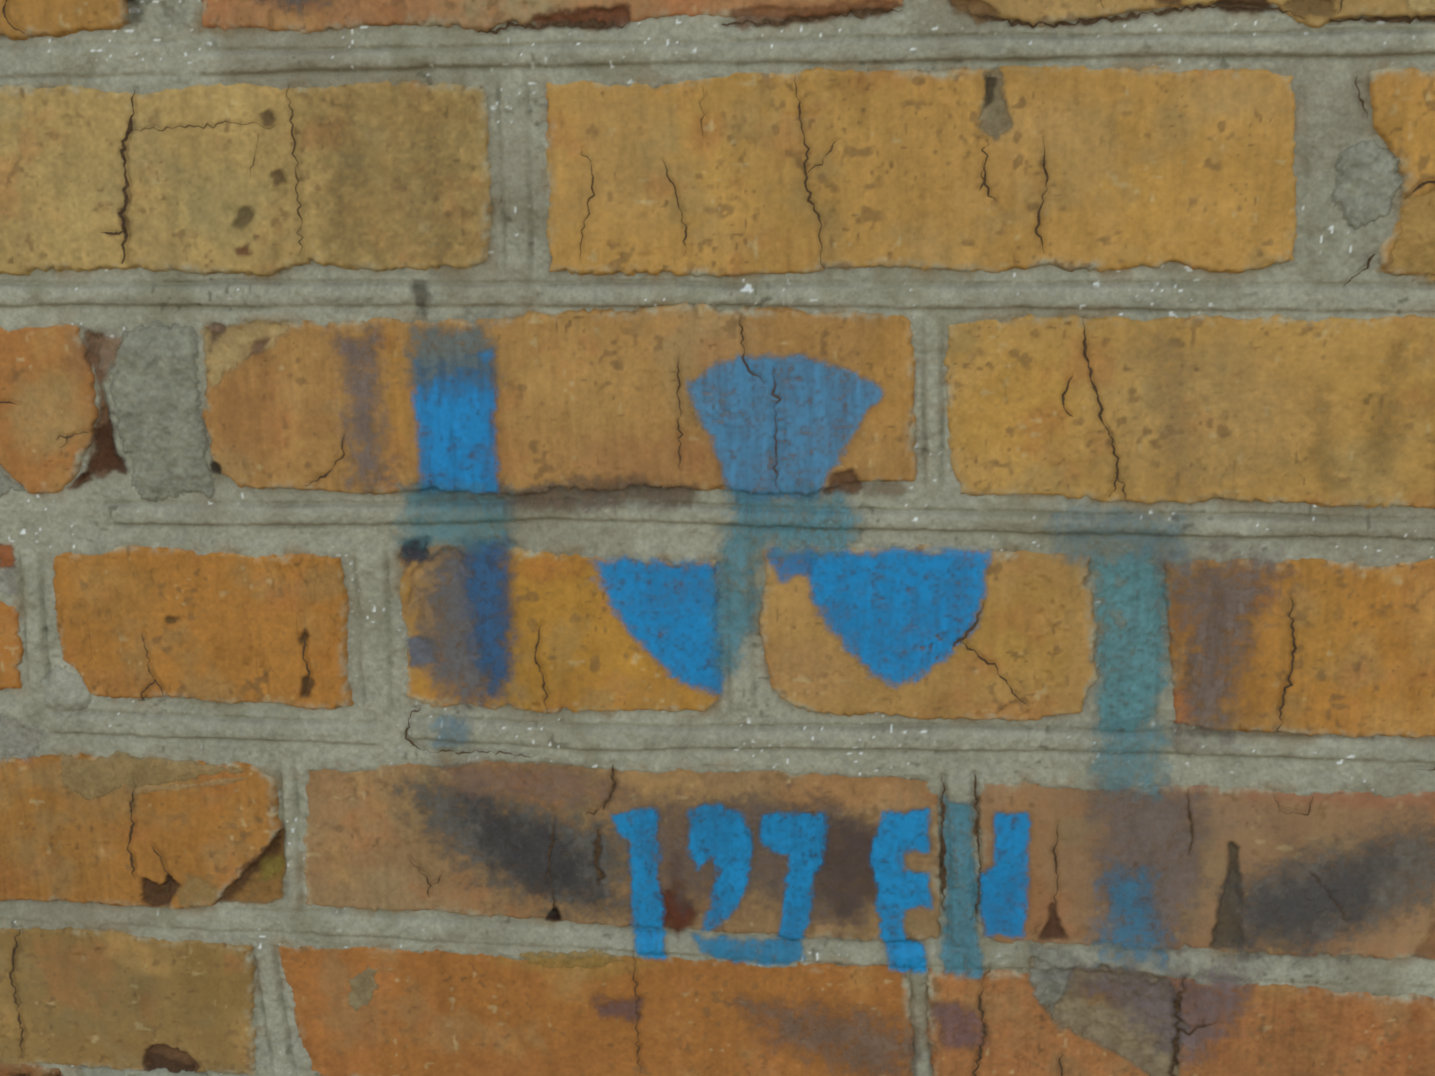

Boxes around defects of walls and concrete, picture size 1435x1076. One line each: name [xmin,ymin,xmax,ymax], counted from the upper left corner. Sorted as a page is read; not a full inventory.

crack [100,82,303,264]
crack [795,82,836,269]
crack [979,139,997,202]
peeling [978,68,1012,139]
crack [1035,142,1049,252]
spalling [68,330,126,489]
crack [739,313,781,492]
crack [1062,317,1126,500]
spalling [142,829,286,907]
spalling [1029,904,1189,1076]